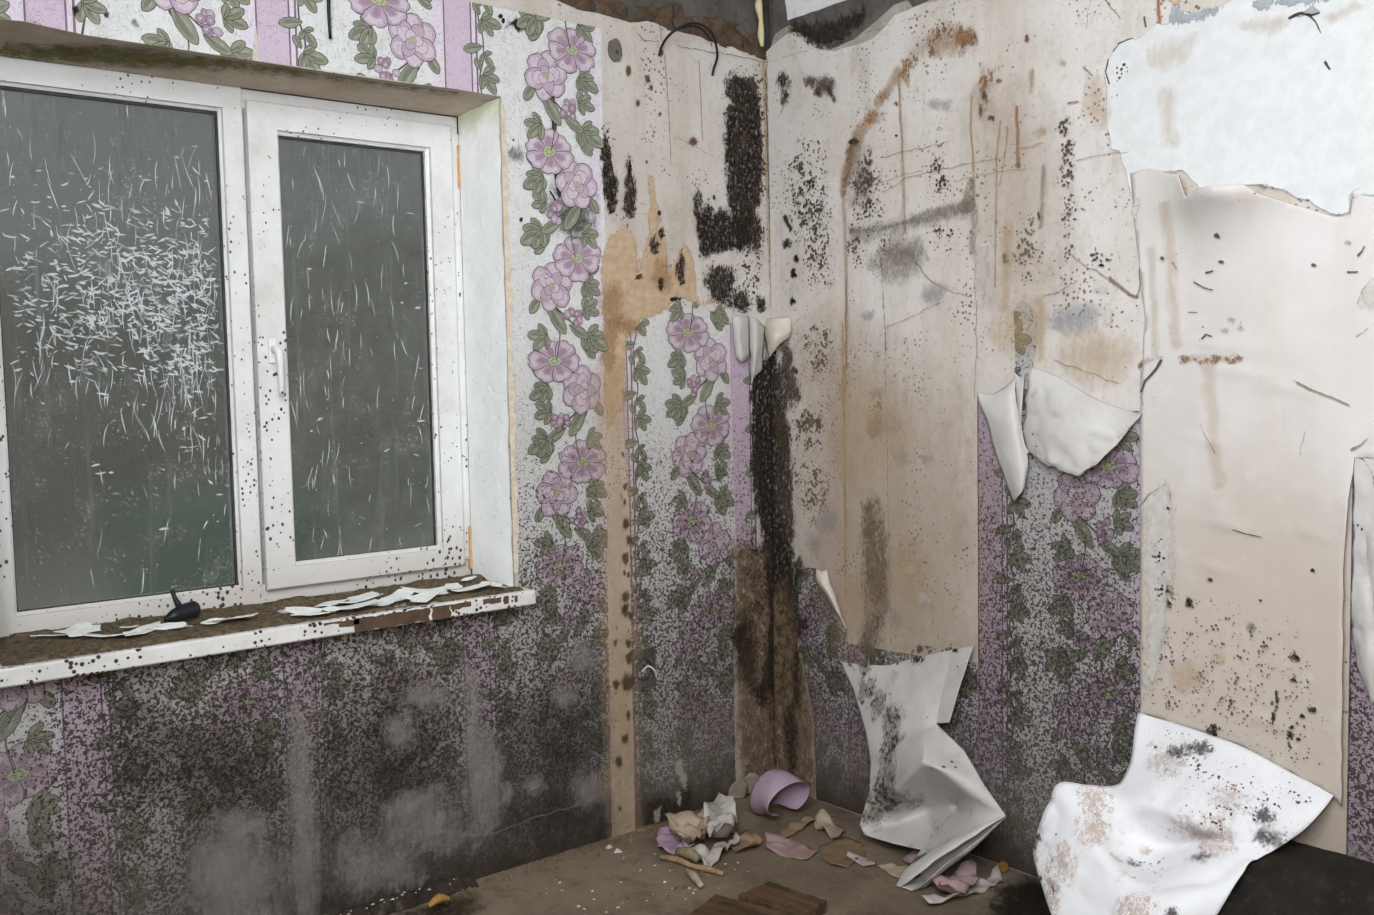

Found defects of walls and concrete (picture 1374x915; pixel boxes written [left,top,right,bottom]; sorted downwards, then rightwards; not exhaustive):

spalling [557,0,938,60]
peeling [1104,0,1374,215]
damp [549,65,836,426]
damp [782,138,890,289]
damp [918,157,953,210]
peeling [977,367,1142,503]
spalling [324,595,518,632]
damp [729,321,836,798]
damp [1142,585,1323,767]
damp [400,897,481,915]